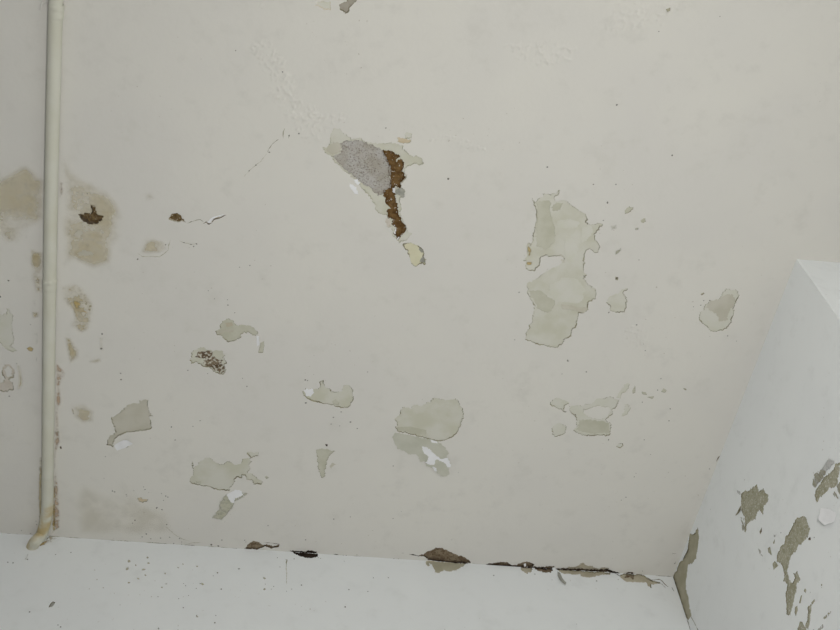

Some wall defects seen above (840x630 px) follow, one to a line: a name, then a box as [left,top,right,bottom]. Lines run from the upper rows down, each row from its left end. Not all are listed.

water stain [72,195,113,263]
spalling [323,128,426,267]
peeling [523,190,603,348]
spalling [190,347,227,375]
peeling [392,398,464,477]
peeling [736,484,768,532]
peeling [812,459,840,502]
spalling [244,541,279,550]
spalling [290,550,318,558]
spalling [410,548,471,573]
peeling [521,529,699,630]
peeling [758,516,831,630]